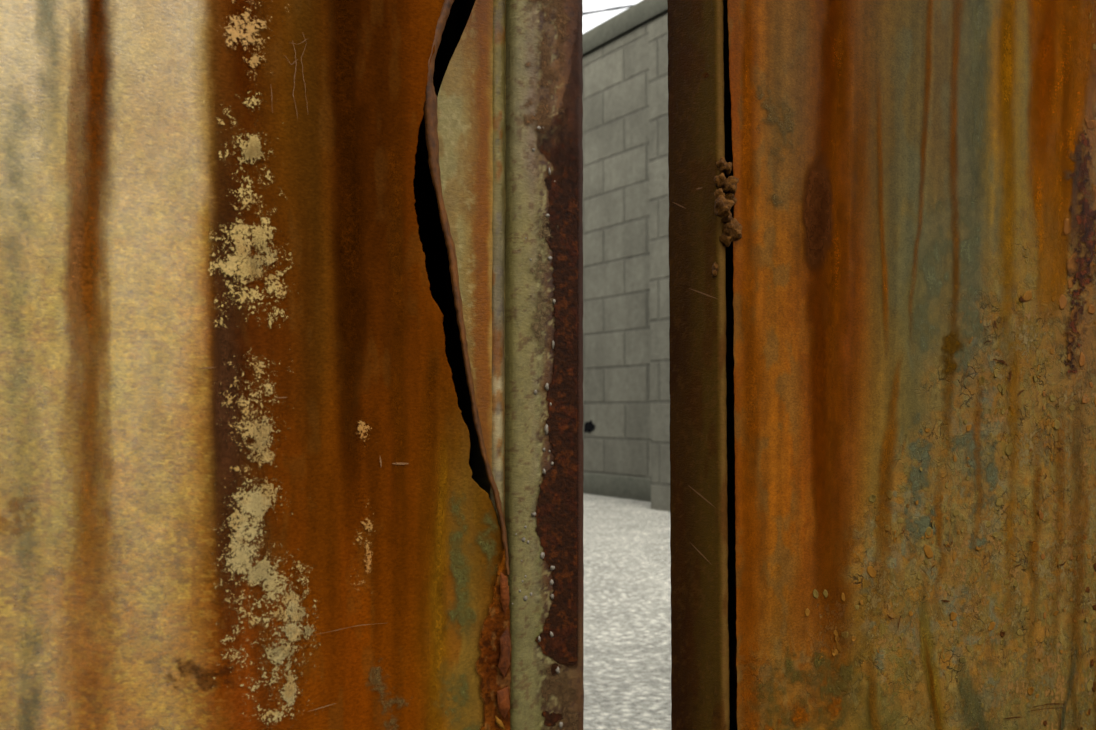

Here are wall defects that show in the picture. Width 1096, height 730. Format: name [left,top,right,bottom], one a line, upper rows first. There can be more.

corrosion [68,0,111,568]
peeling [219,0,272,112]
peeling [208,104,299,329]
corrosion [524,0,570,130]
corrosion [803,160,833,267]
corrosion [942,229,963,392]
corrosion [1000,0,1015,278]
corrosion [1031,0,1096,296]
peeling [212,349,321,725]
corrosion [476,549,511,730]
corrosion [541,666,578,730]
corrosion [920,613,943,730]